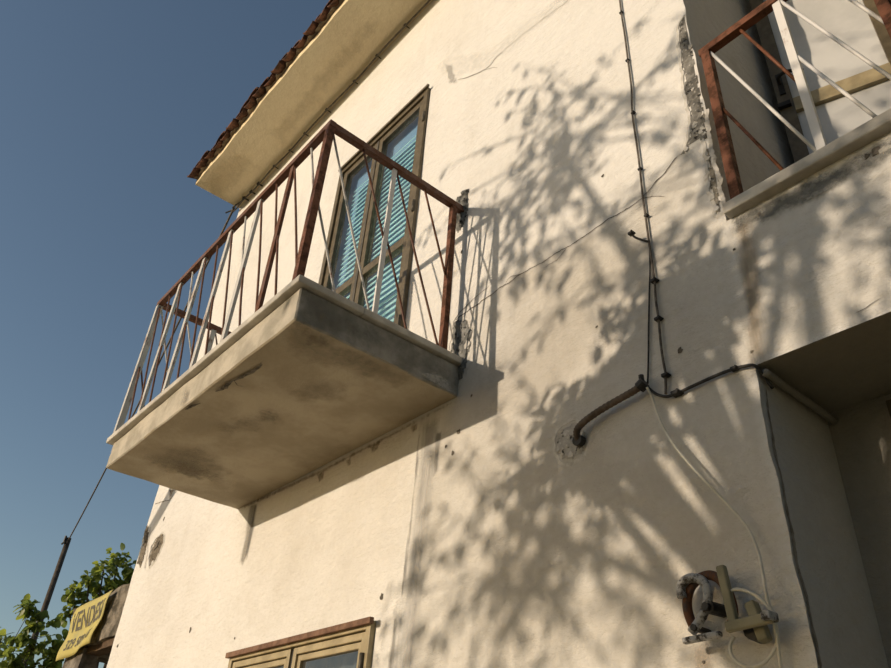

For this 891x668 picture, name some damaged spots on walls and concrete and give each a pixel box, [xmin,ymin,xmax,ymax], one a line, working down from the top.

crack [462,0,568,79]
spalling [676,15,726,219]
damp [736,143,891,228]
crack [453,157,677,322]
spalling [448,314,476,398]
spalling [137,525,165,569]